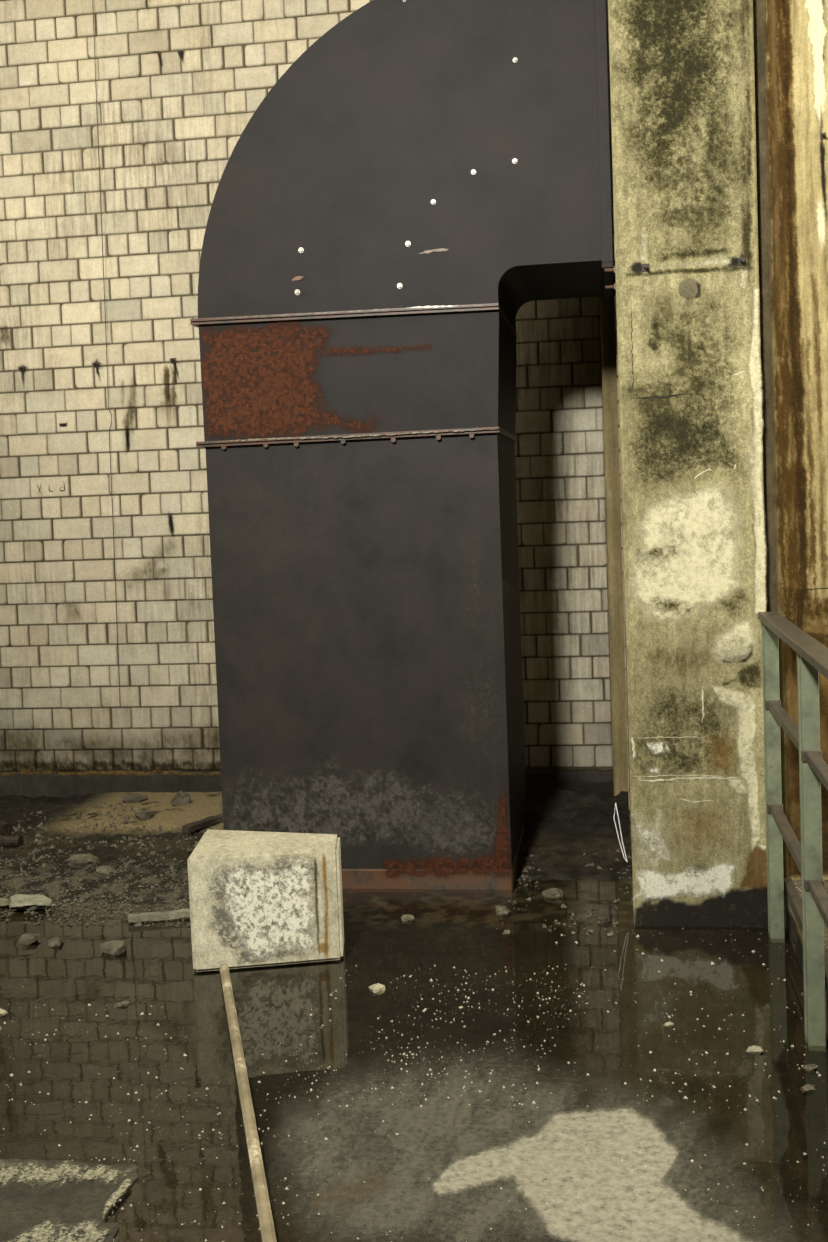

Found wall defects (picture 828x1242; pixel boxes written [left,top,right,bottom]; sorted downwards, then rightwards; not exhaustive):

leakage [164,363,178,406]
rust [201,320,431,438]
leakage [620,0,766,614]
rust [765,0,828,648]
rust [782,643,801,876]
rust [819,672,828,764]